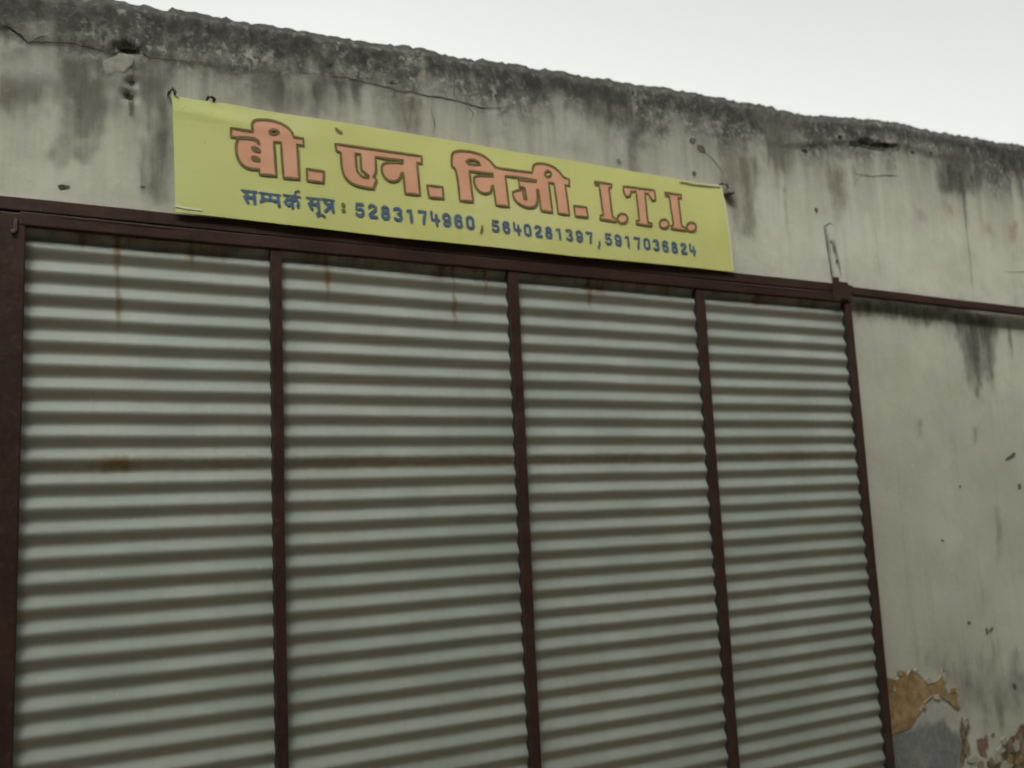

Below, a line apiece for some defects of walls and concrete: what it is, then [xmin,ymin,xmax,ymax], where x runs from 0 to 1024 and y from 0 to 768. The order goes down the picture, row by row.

crack [0,26,203,80]
crack [296,67,502,131]
water stain [987,145,1024,173]
water stain [961,317,993,381]
peeling [887,668,1024,768]